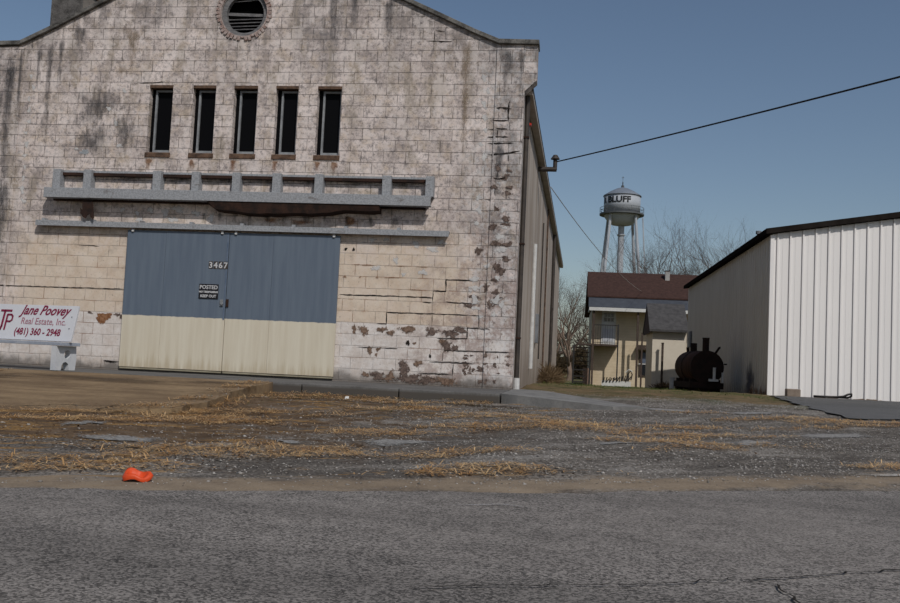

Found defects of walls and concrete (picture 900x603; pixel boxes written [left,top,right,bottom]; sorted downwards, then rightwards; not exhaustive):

leakage [0,60,36,203]
peeling [490,164,513,195]
peeling [464,206,512,319]
spalling [88,311,122,324]
peeling [352,324,510,387]